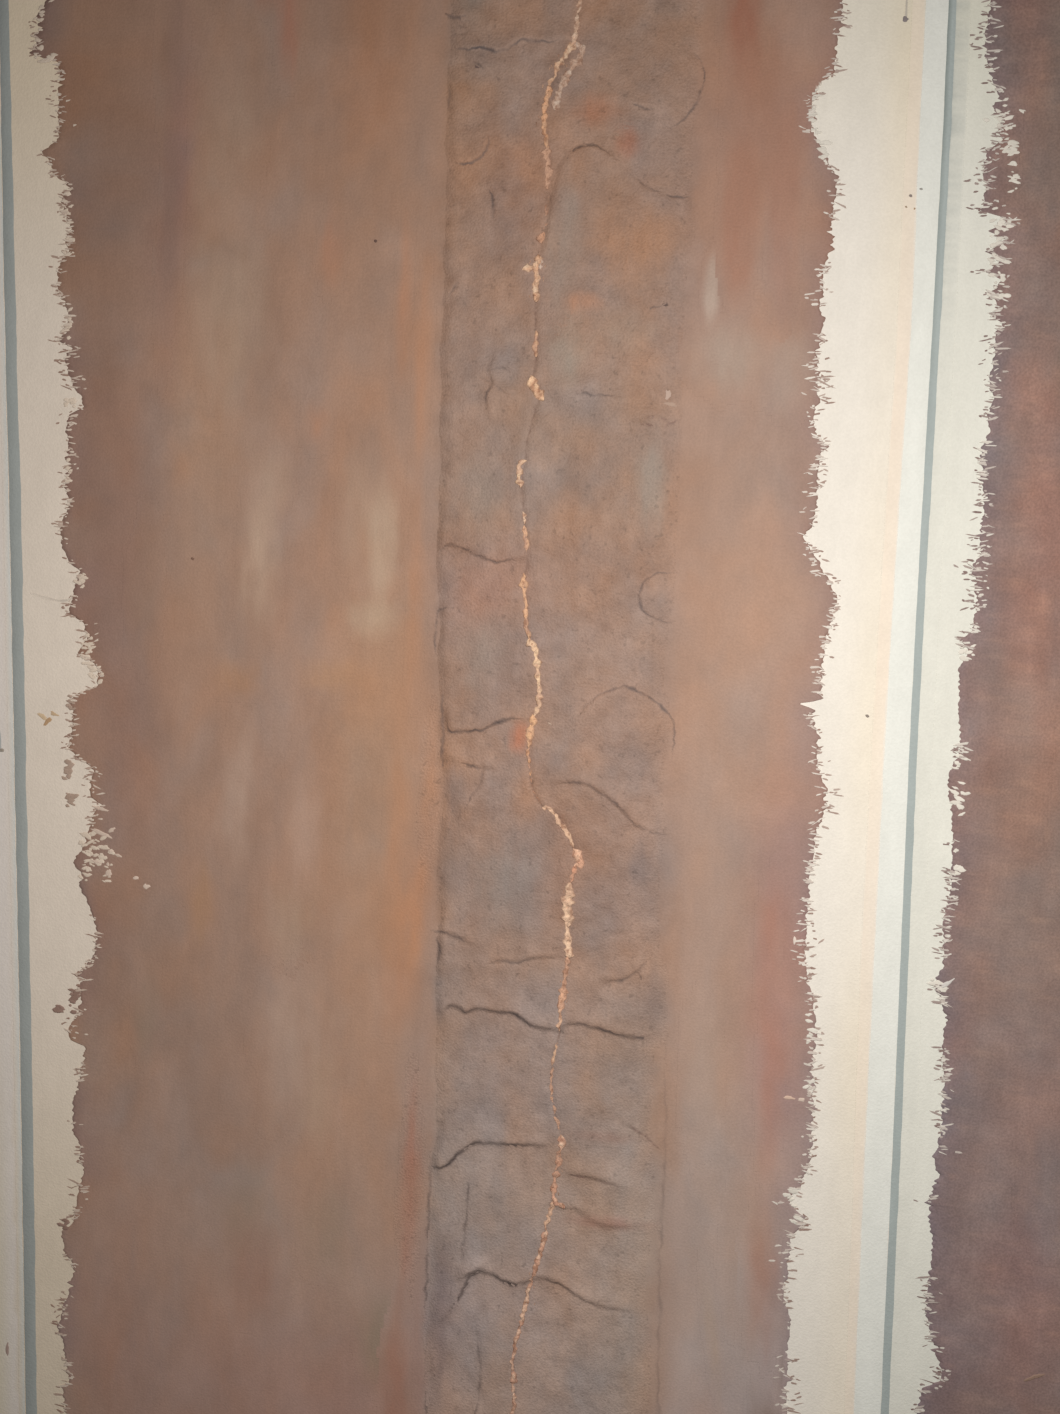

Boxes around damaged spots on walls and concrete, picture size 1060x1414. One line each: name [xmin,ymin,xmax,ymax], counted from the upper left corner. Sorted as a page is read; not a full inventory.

crack [608,52,706,128]
corrosion [713,0,822,343]
crack [422,0,679,1414]
corrosion [735,857,793,1379]